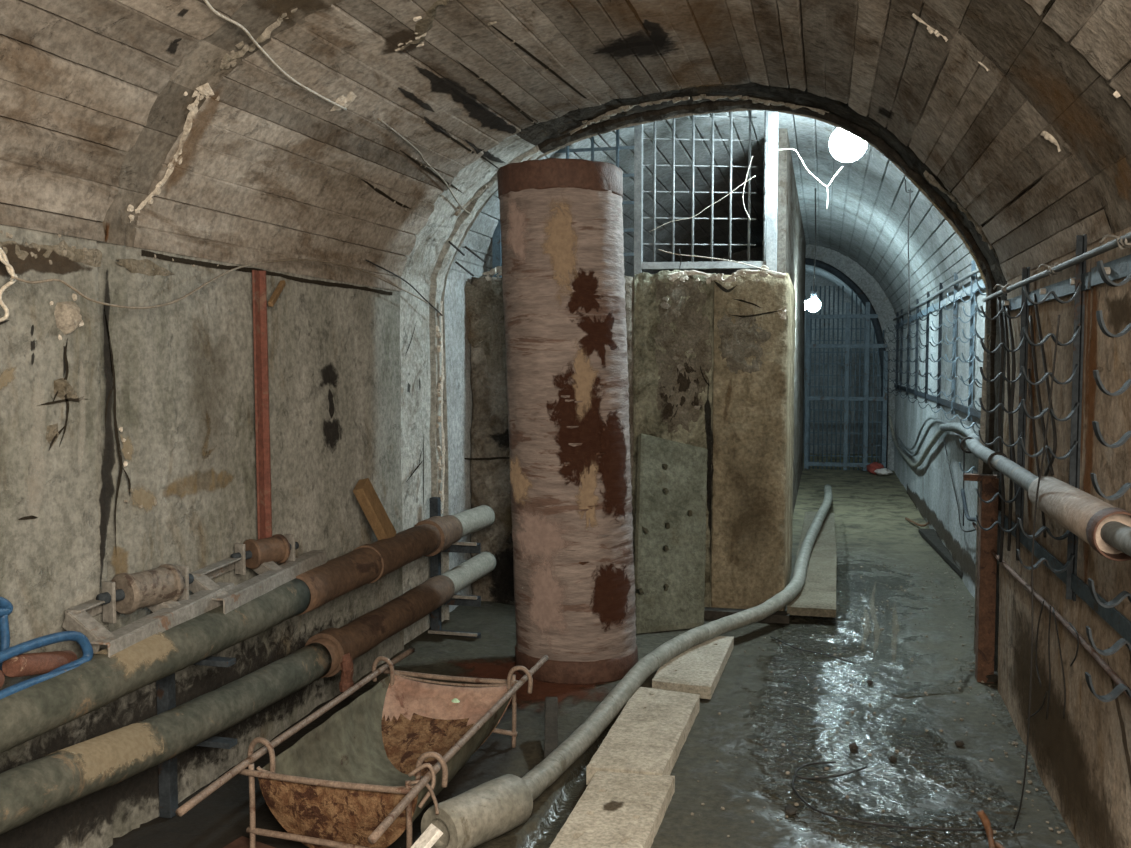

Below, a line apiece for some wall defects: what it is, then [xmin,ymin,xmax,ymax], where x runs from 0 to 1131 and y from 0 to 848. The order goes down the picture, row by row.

crack [610,0,651,36]
water stain [594,19,678,58]
spalling [0,230,175,276]
corrosion [546,268,628,522]